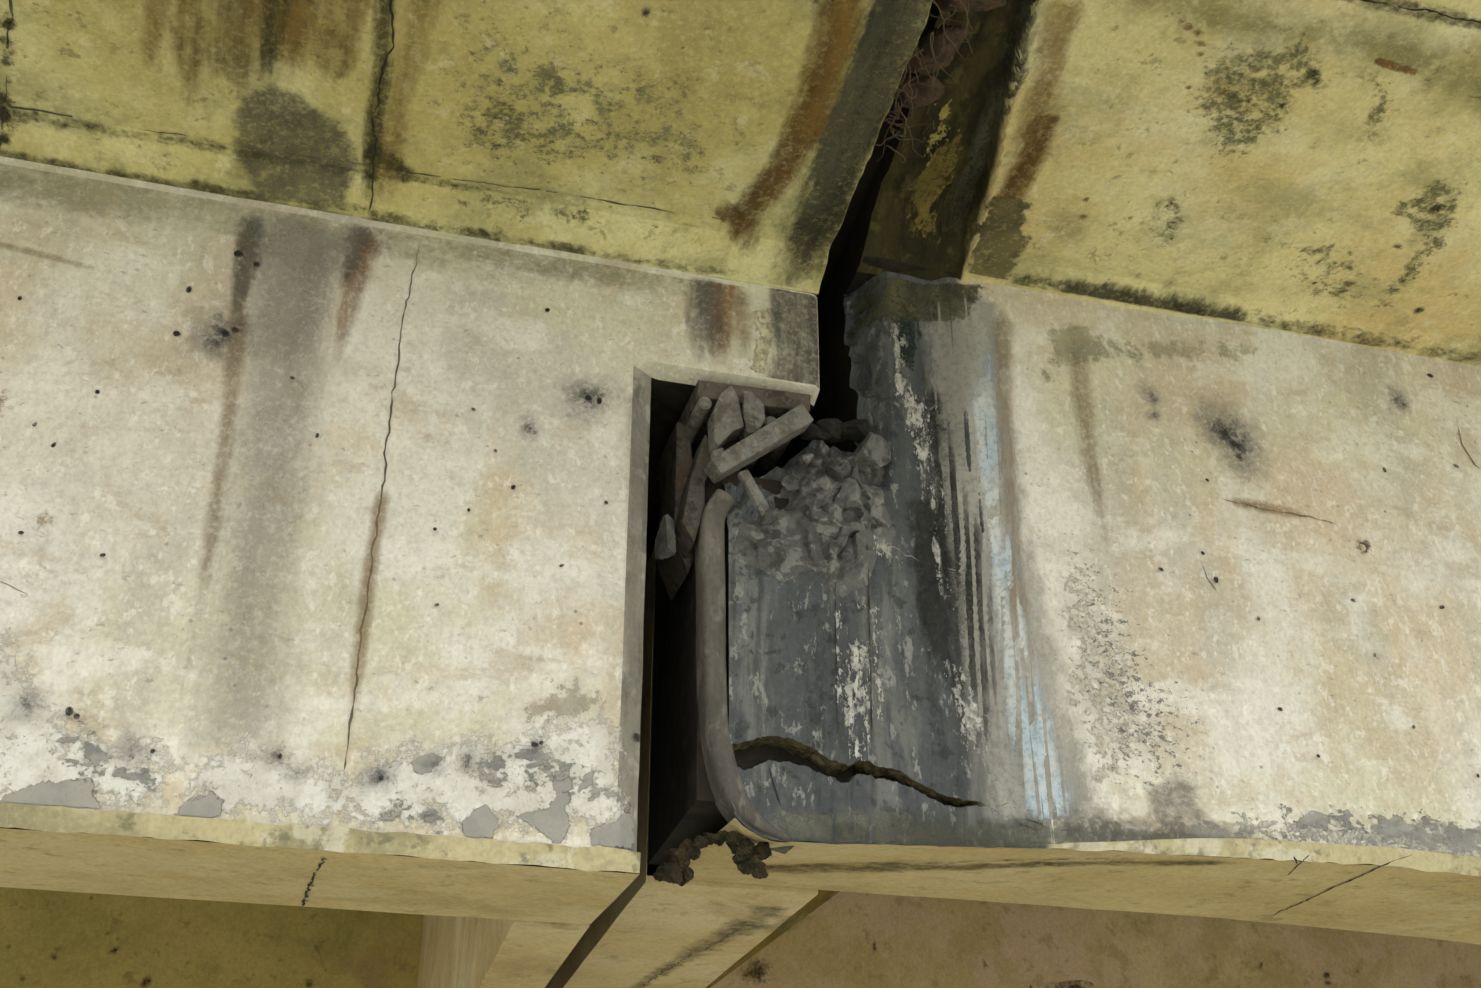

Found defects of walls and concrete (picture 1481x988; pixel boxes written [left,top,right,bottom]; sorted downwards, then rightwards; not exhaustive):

crack [0,0,105,148]
crack [147,130,674,213]
corrosion [716,0,861,246]
corrosion [964,6,1073,280]
leakage [0,0,683,638]
crack [344,243,420,770]
spalling [728,445,903,761]
peeling [889,323,954,609]
leakage [765,277,1250,873]
peeling [0,631,640,852]
crack [721,736,1071,831]
peeling [1231,797,1481,857]